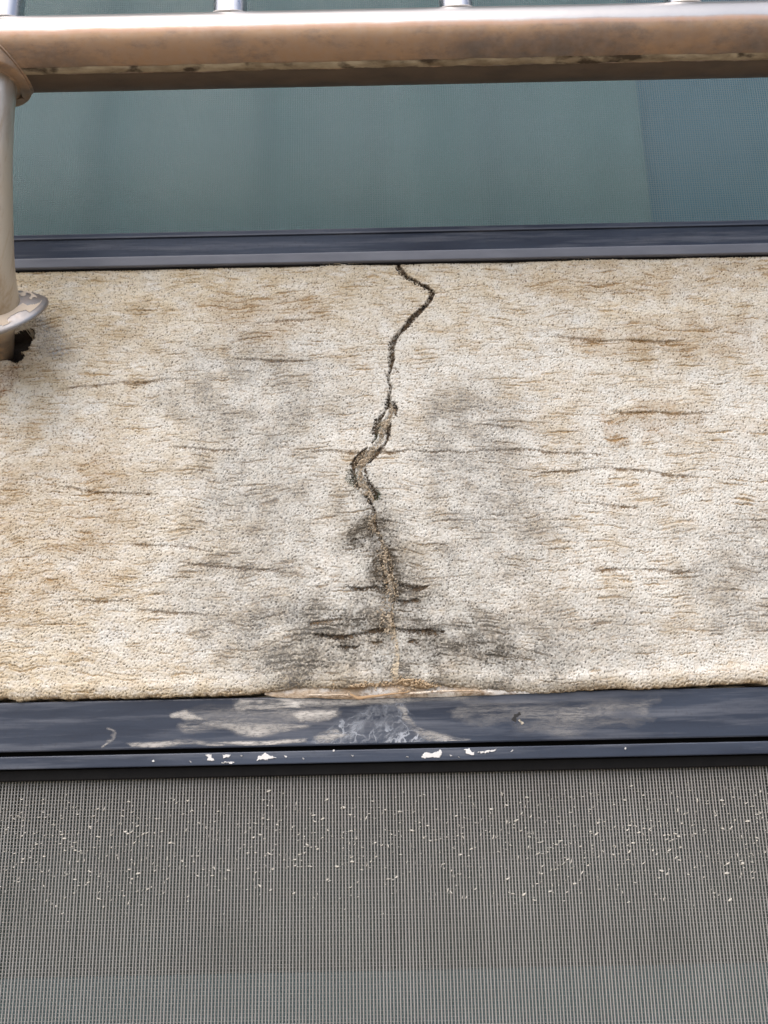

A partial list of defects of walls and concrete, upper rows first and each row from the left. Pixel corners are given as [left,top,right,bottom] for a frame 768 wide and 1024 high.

crack [310,266,445,650]
leakage [235,508,552,736]